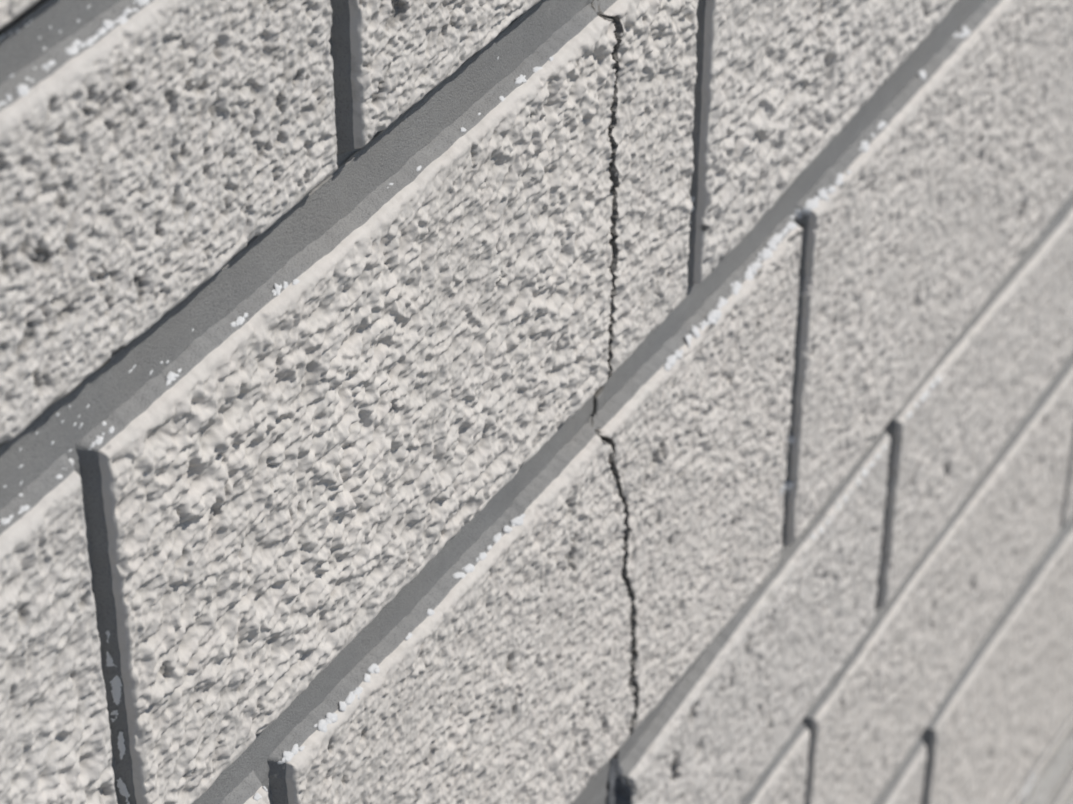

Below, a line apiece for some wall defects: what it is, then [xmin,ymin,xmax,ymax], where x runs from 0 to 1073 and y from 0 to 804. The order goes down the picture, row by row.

crack [0,0,543,451]
crack [591,0,640,787]